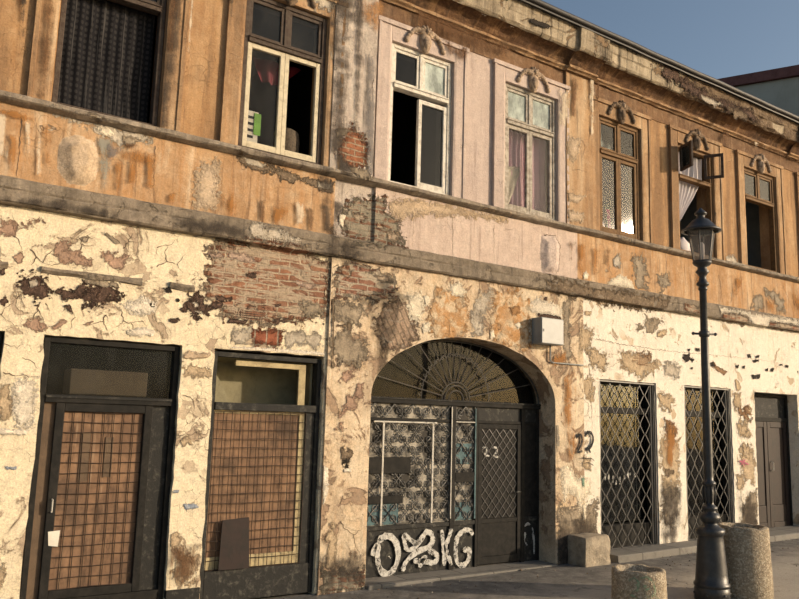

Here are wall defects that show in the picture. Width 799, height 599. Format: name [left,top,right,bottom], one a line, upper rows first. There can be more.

leakage [42,0,54,72]
leakage [162,0,193,127]
leakage [331,0,382,173]
peeling [0,216,46,238]
crack [0,216,60,267]
crack [0,293,145,331]
spalling [13,232,159,338]
spalling [236,149,335,194]
flaking render [338,193,512,251]
flaking render [162,221,700,432]
peeling [658,388,682,530]
peeling [733,379,758,525]